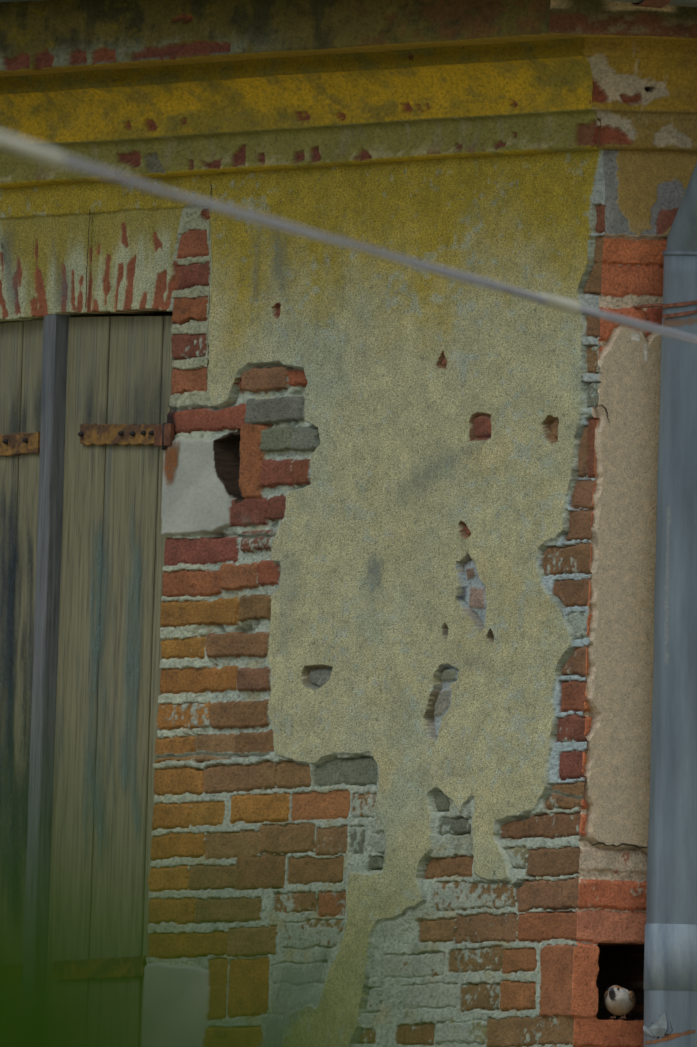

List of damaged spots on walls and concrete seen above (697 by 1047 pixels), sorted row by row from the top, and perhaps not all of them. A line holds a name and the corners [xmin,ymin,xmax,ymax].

peeling [652,123,694,149]
spalling [0,204,387,922]
spalling [370,52,686,1047]